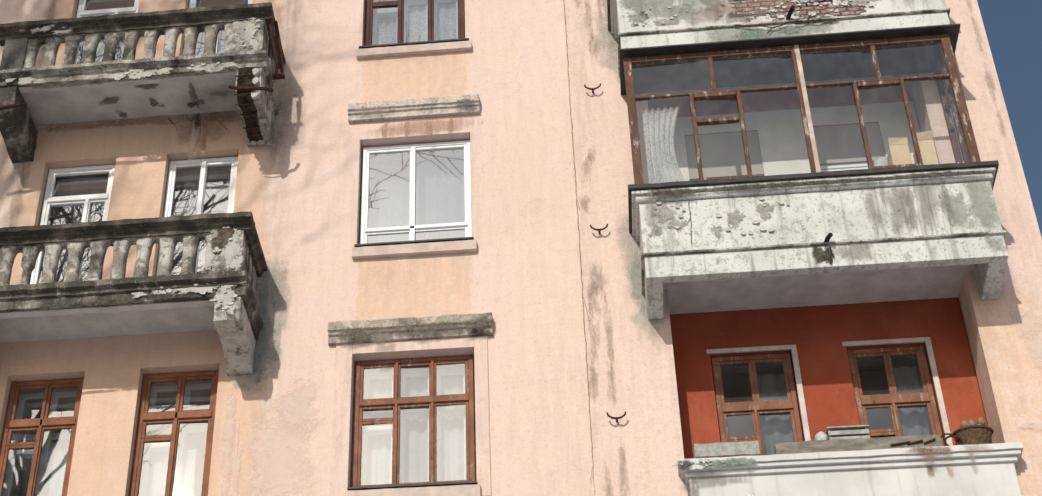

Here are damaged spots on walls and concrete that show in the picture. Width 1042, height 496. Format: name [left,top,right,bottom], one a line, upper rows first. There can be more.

spalling [19,24,73,34]
peeling [233,17,264,51]
flaking render [727,0,877,21]
spalling [5,62,266,145]
peeling [39,226,244,315]
crack [563,0,595,489]
damp [812,245,834,265]
damp [944,181,1003,250]
damp [236,268,286,387]